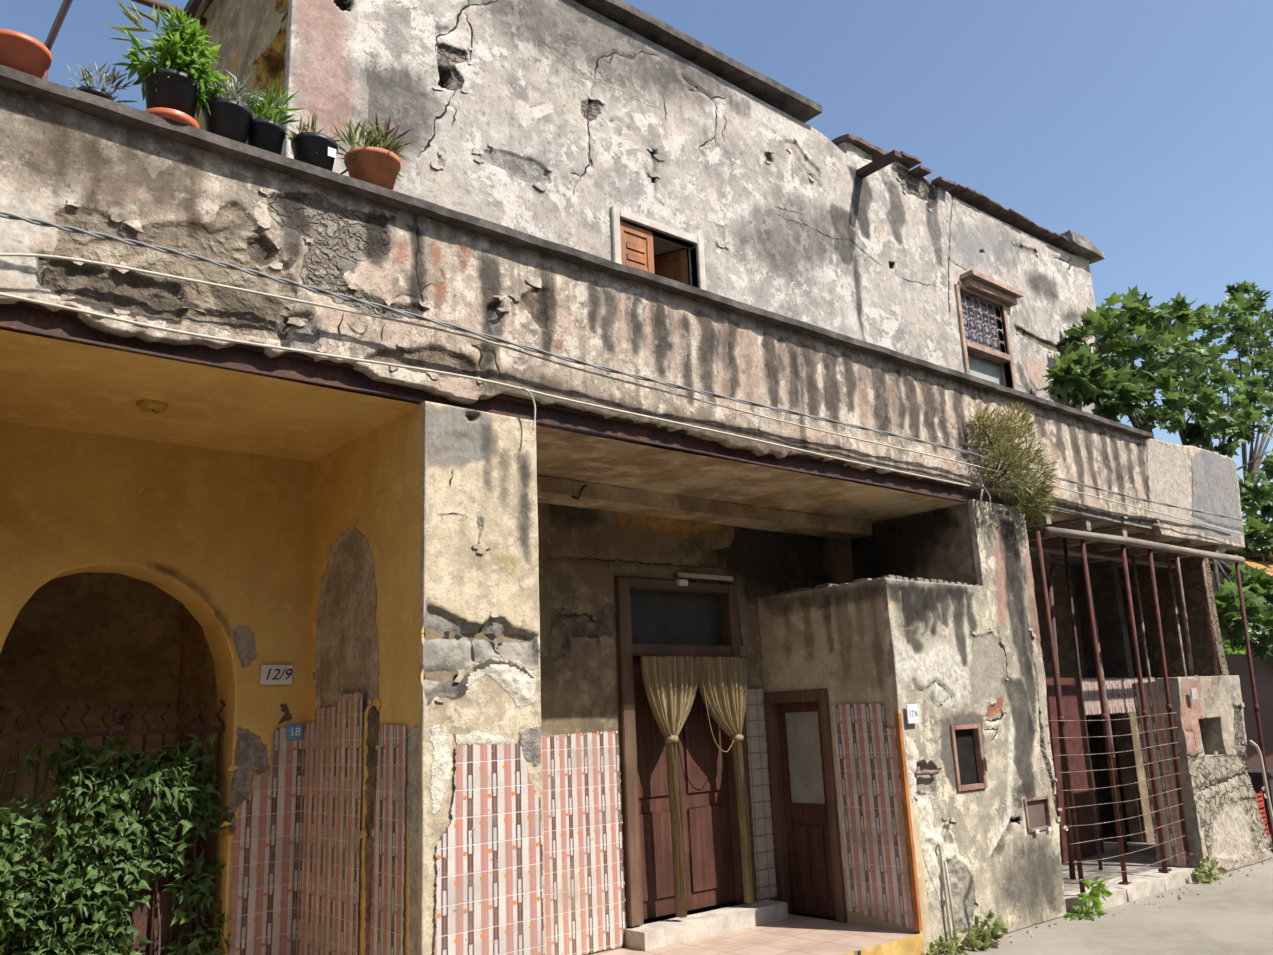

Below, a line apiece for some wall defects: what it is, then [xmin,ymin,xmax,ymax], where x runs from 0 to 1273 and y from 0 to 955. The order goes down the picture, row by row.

crack [435,0,498,60]
crack [420,91,457,155]
crack [571,50,659,188]
crack [661,77,727,154]
flaking render [35,188,432,353]
water stain [409,227,426,314]
water stain [832,166,872,326]
water stain [466,250,966,481]
water stain [1036,417,1149,503]
flaking render [421,600,616,702]
flaking render [310,519,381,955]
flaking render [1188,702,1271,861]